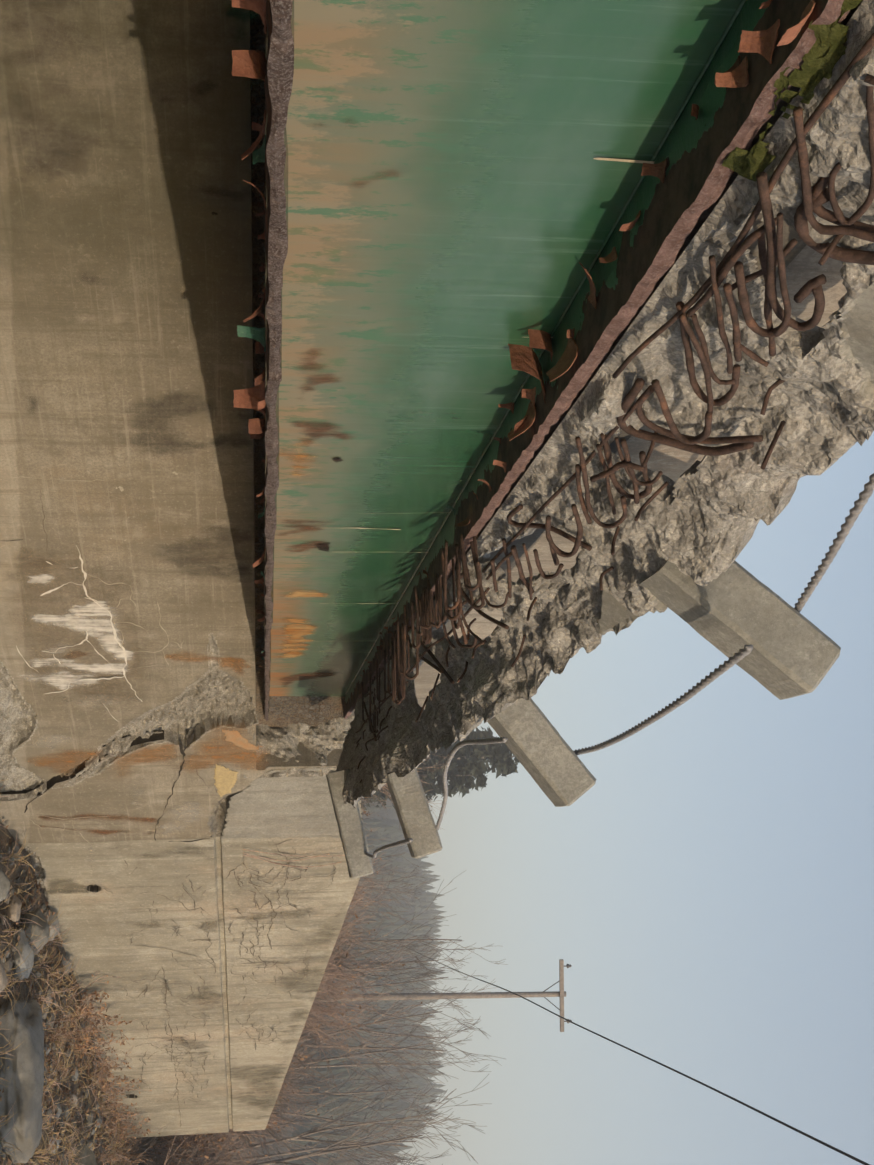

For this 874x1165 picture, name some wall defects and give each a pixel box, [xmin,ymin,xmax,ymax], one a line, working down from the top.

peeling [232,0,267,34]
peeling [232,50,267,88]
peeling [241,109,267,164]
peeling [237,287,266,354]
peeling [233,367,266,439]
spalling [329,0,874,808]
water stain [29,574,54,583]
water stain [32,601,133,689]
crack [0,476,237,843]
spalling [0,633,263,801]
corrosion [76,815,155,834]
crack [104,839,337,1127]